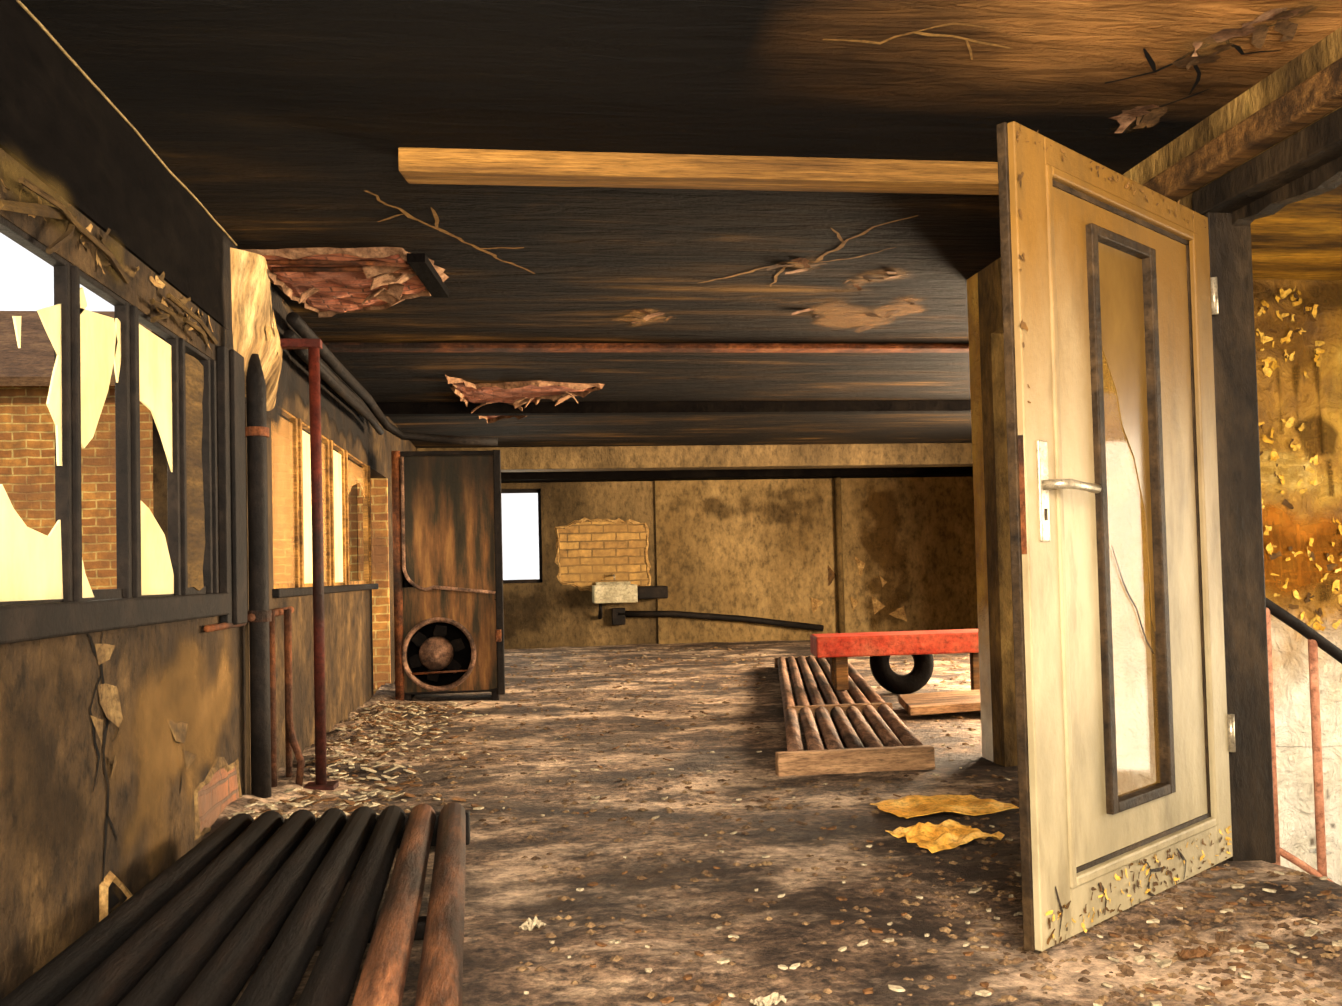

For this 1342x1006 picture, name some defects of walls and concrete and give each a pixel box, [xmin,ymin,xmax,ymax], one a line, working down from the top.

crack [823,22,1012,60]
spalling [239,247,449,318]
crack [365,190,535,274]
peeling [766,258,827,274]
crack [700,215,918,287]
peeling [843,269,906,291]
peeling [617,310,673,325]
peeling [792,298,923,333]
spalling [445,375,605,424]
spalling [555,518,651,592]
crack [87,633,123,881]